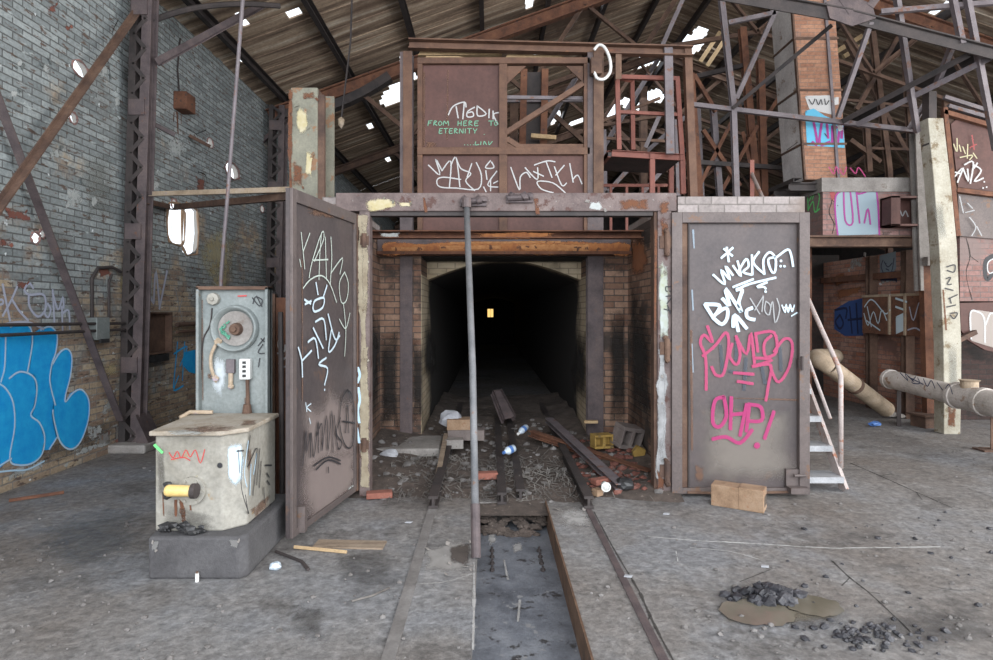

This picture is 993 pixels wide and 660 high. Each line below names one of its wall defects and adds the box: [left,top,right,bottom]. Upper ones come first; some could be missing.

peeling [294,103,309,132]
peeling [305,151,314,174]
corrosion [382,232,630,256]
peeling [658,264,670,336]
peeling [304,197,412,515]
leakage [414,349,423,415]
peeling [655,350,668,479]